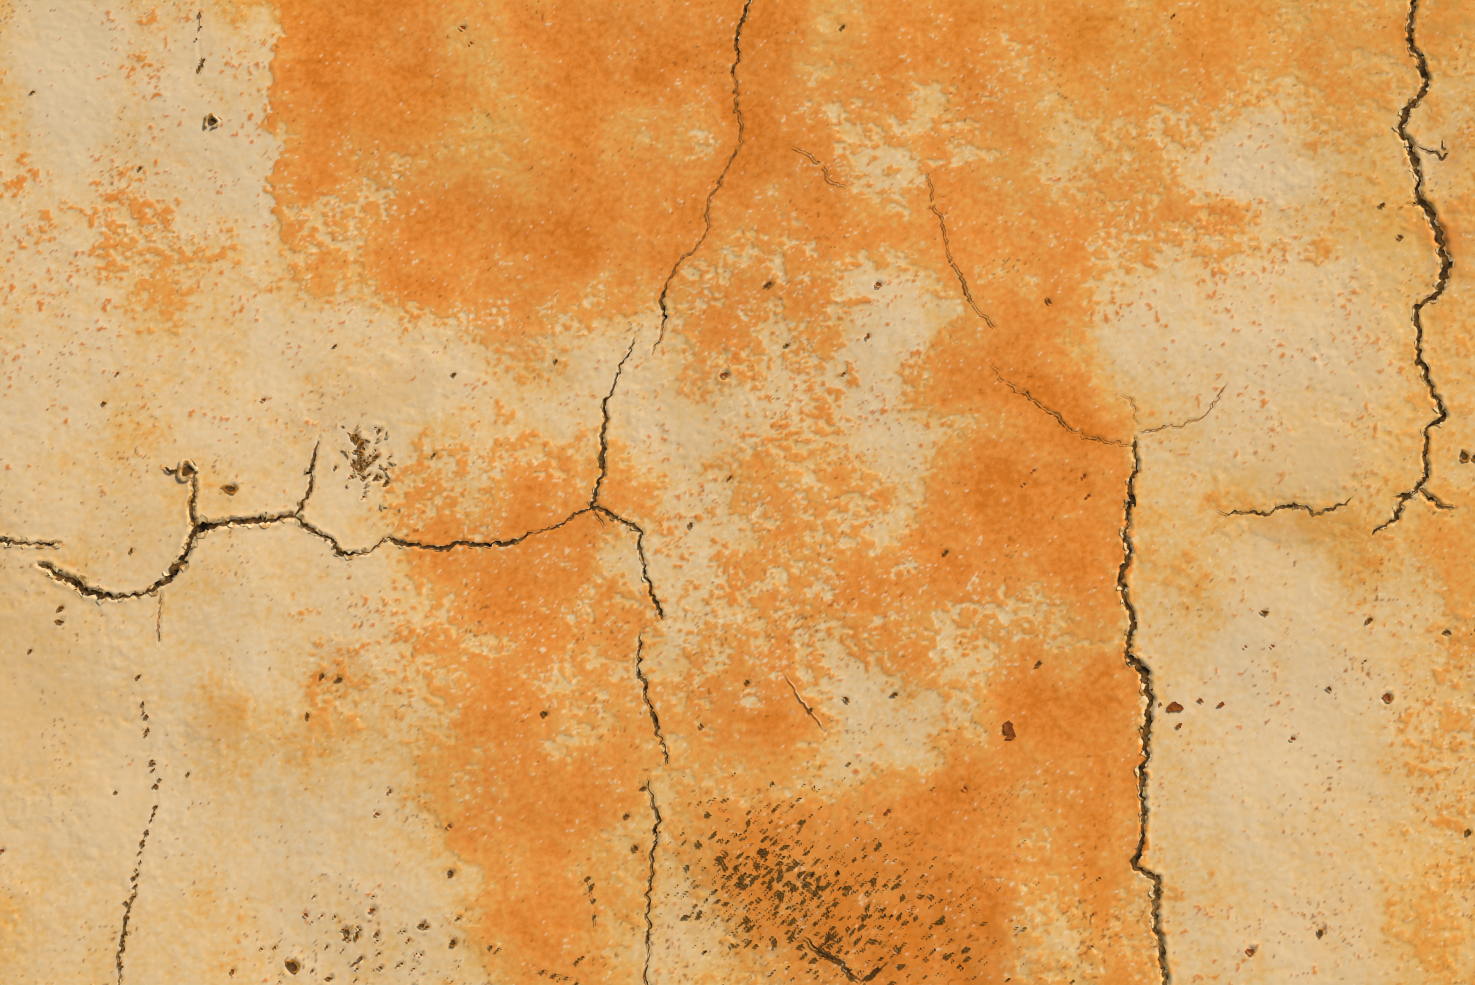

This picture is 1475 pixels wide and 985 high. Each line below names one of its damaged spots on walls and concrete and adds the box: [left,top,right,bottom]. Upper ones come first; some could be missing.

crack [795,147,847,187]
crack [927,171,995,327]
crack [1373,0,1455,535]
crack [0,0,752,985]
crack [1218,497,1353,516]
corrosion [1004,720,1016,739]
crack [992,364,1227,985]
corrosion [1159,698,1225,728]